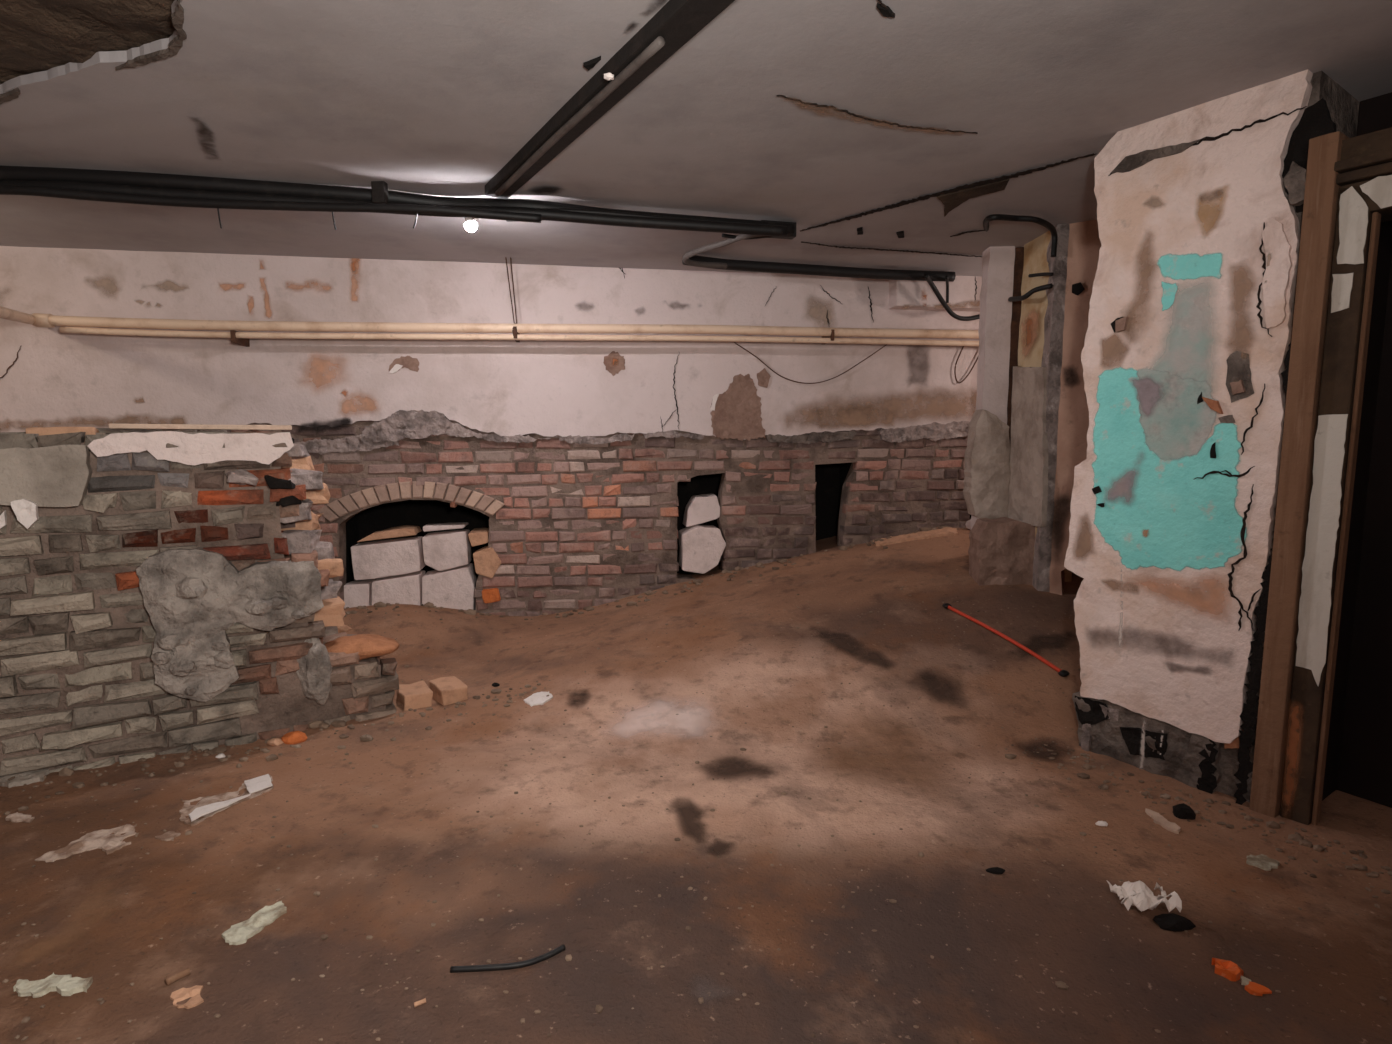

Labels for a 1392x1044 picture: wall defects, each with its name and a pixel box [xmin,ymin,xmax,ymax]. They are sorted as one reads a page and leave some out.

spalling [0,0,187,104]
crack [777,95,978,134]
crack [1193,106,1307,146]
crack [0,346,21,378]
spalling [389,356,419,374]
spalling [877,421,970,443]
peeling [1092,253,1254,571]
peeling [0,498,39,529]
spalling [225,368,857,626]
crack [1194,222,1291,805]
spalling [1072,691,1239,793]